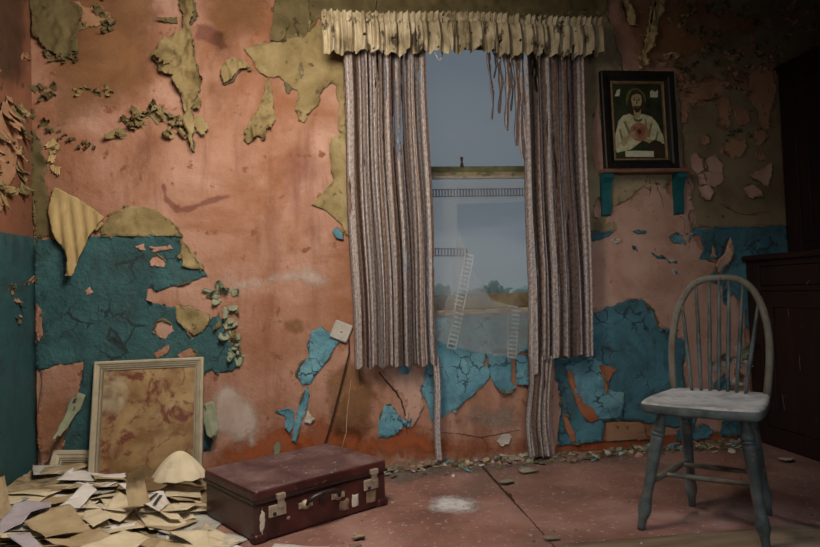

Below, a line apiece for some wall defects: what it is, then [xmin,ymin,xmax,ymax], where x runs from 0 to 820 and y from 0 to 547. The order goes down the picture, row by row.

peeling [220,0,788,446]
peeling [0,81,245,486]
water stain [216,364,512,467]
crack [379,372,408,435]
crack [441,430,555,547]